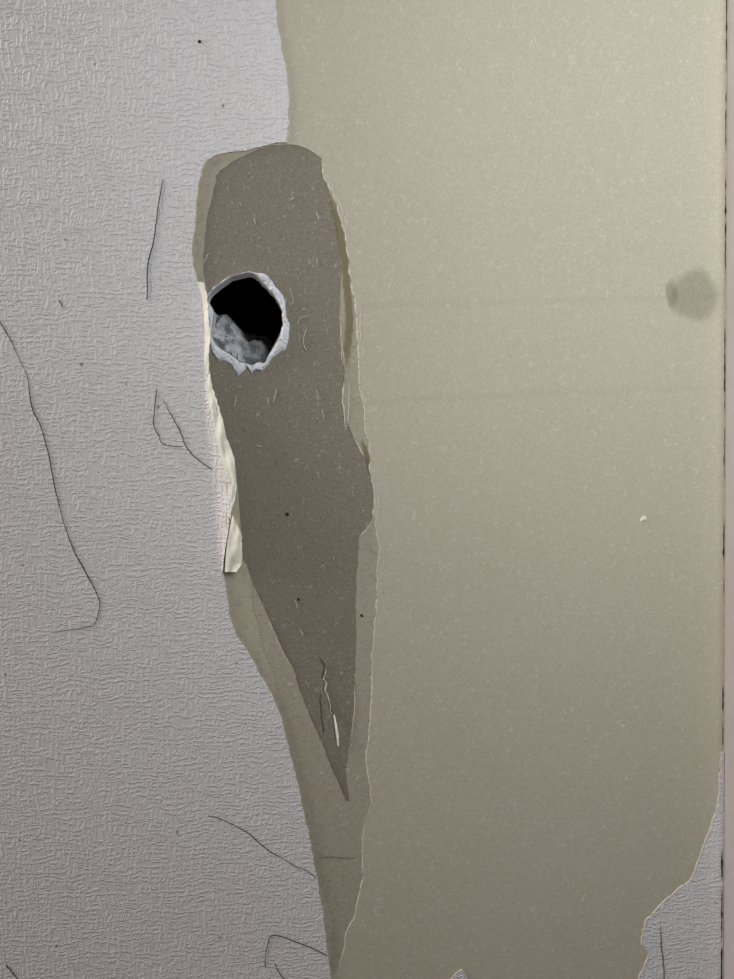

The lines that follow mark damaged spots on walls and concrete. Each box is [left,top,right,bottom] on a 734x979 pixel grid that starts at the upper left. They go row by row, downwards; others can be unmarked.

peeling [197,281,290,572]
peeling [275,0,728,979]